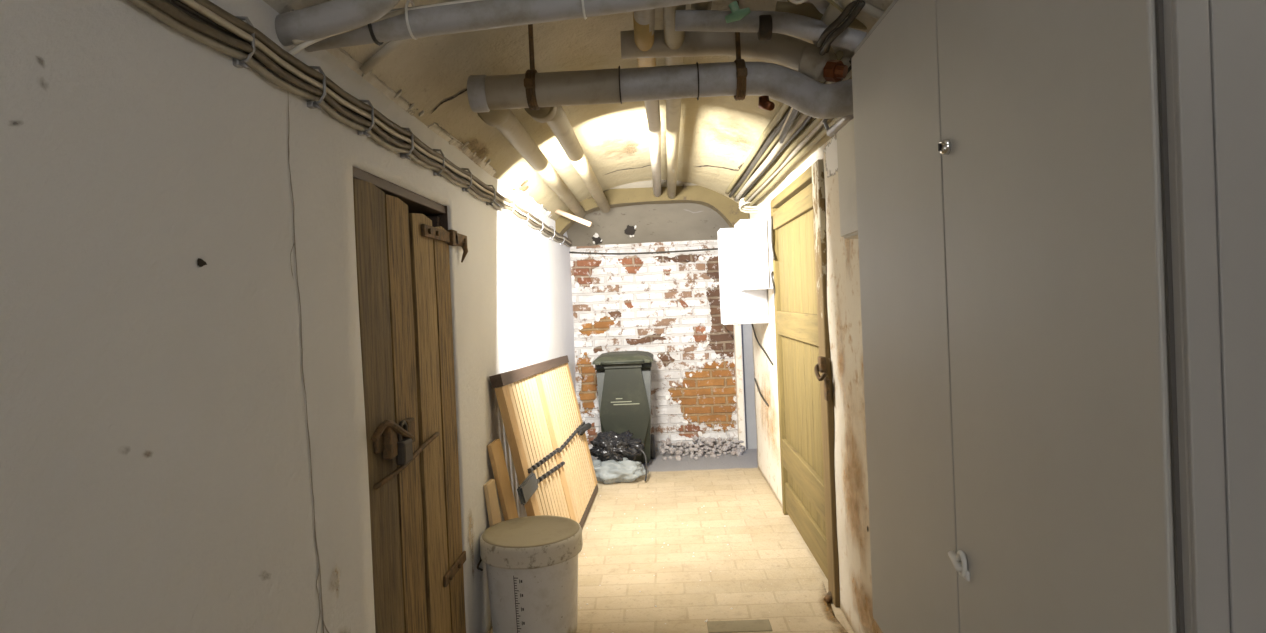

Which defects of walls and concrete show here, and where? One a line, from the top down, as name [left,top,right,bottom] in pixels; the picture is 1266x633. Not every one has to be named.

flaking render [571,233,738,443]